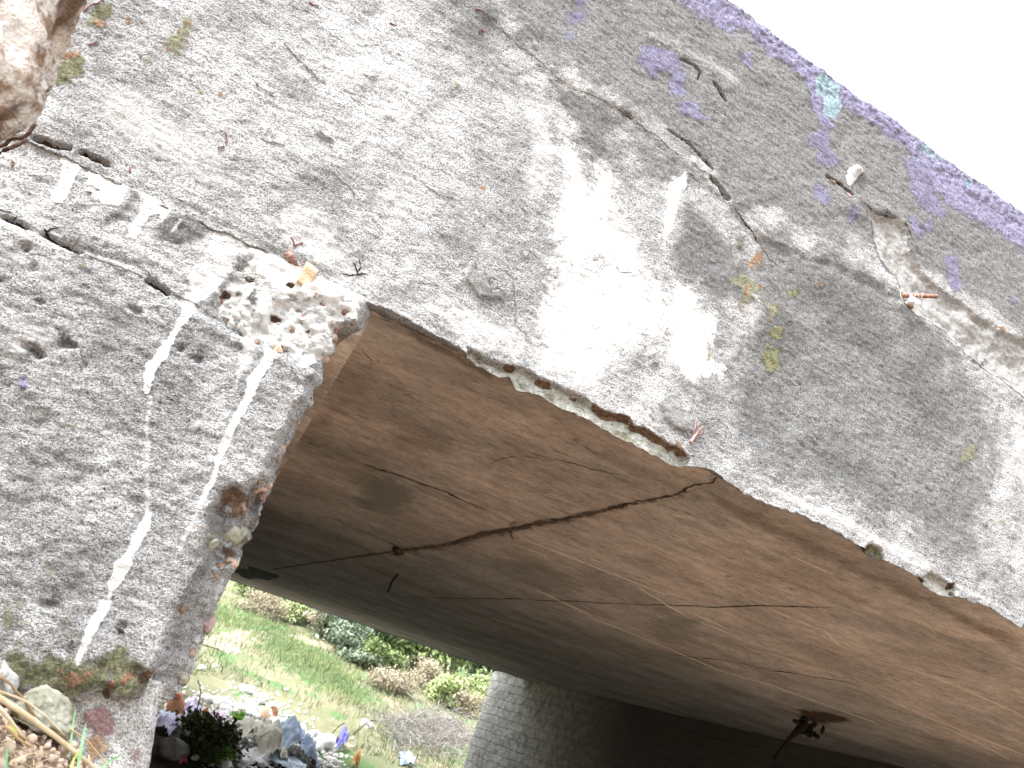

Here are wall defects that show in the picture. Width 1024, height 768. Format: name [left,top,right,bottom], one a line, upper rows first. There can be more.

crack [483,12,777,265]
crack [0,209,199,306]
crack [36,140,285,255]
damp [253,274,294,318]
damp [400,0,1024,616]
crack [865,203,912,237]
damp [50,156,251,666]
damp [196,339,277,509]
spalling [467,352,690,467]
crack [271,439,718,570]
crack [391,596,831,608]